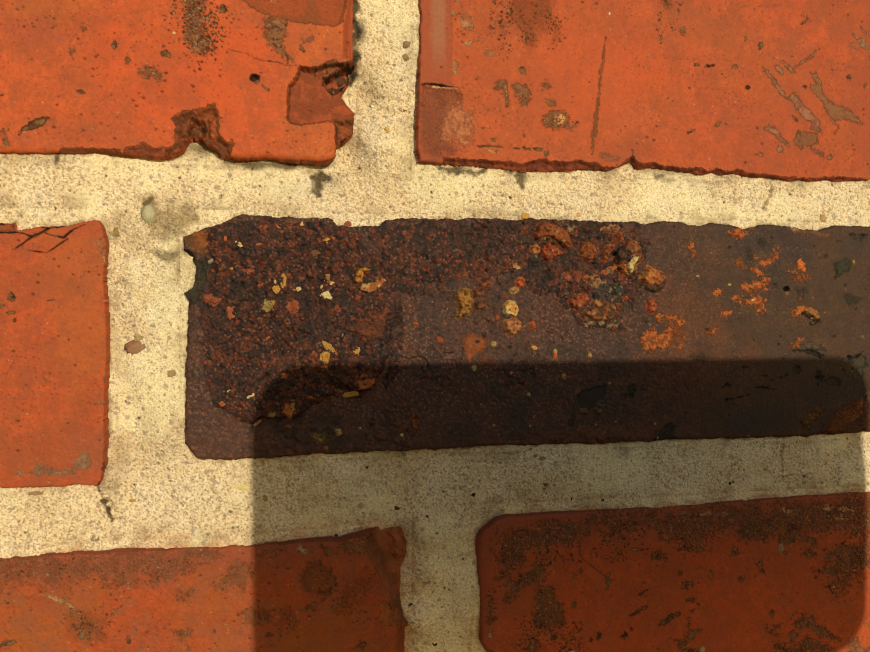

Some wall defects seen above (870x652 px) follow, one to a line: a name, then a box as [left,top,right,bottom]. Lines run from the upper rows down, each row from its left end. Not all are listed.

spalling [161,0,234,70]
spalling [243,0,355,145]
spalling [443,138,866,181]
crack [0,224,85,253]
spalling [183,230,236,320]
peeling [257,273,301,324]
peeling [320,274,342,313]
peeling [353,266,386,299]
peeling [312,331,337,369]
peeling [341,373,375,398]
peeling [253,402,295,428]
spalling [336,526,407,629]